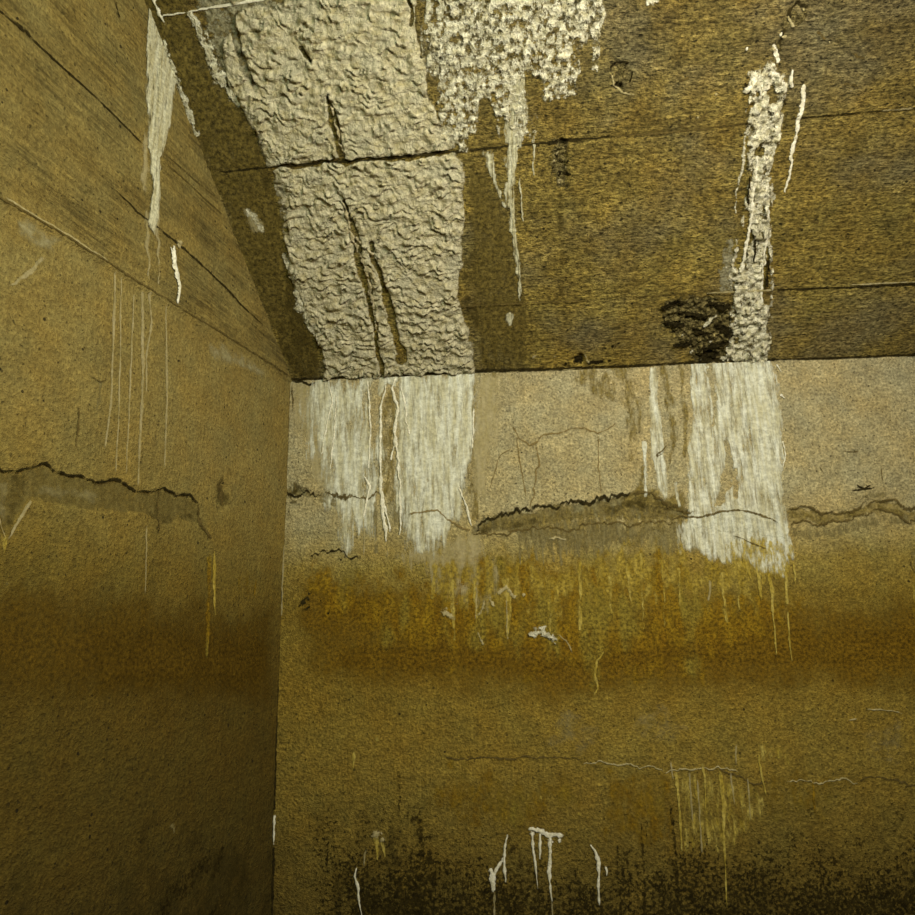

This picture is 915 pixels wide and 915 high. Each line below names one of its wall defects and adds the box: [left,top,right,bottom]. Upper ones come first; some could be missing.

damp [105,275,153,483]
crack [0,190,447,517]
damp [141,0,915,695]
crack [474,353,915,373]
spalling [660,295,741,363]
crack [0,462,212,538]
crack [279,540,287,615]
crack [311,548,361,560]
corrosion [309,539,800,694]
crack [672,469,915,538]
crack [271,646,280,915]
damp [311,745,915,915]